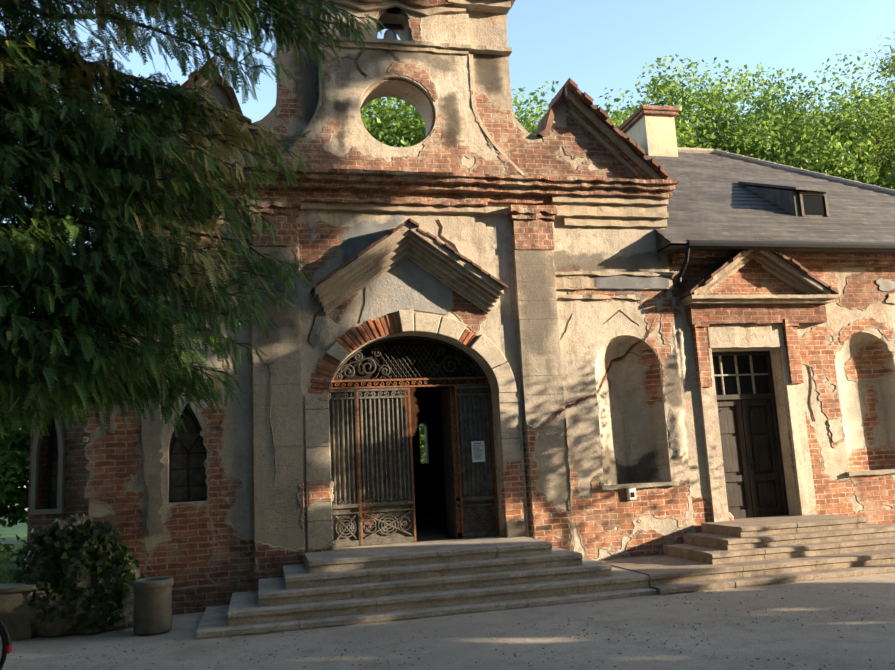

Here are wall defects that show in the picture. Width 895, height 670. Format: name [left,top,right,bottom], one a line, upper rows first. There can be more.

spalling [387,61,439,102]
spalling [254,79,637,179]
spalling [82,389,336,588]
spalling [450,289,488,334]
crack [535,310,658,511]
spalling [499,421,713,560]
spalling [555,264,713,407]
spalling [786,408,800,516]
crack [807,367,815,422]
spalling [798,267,895,526]